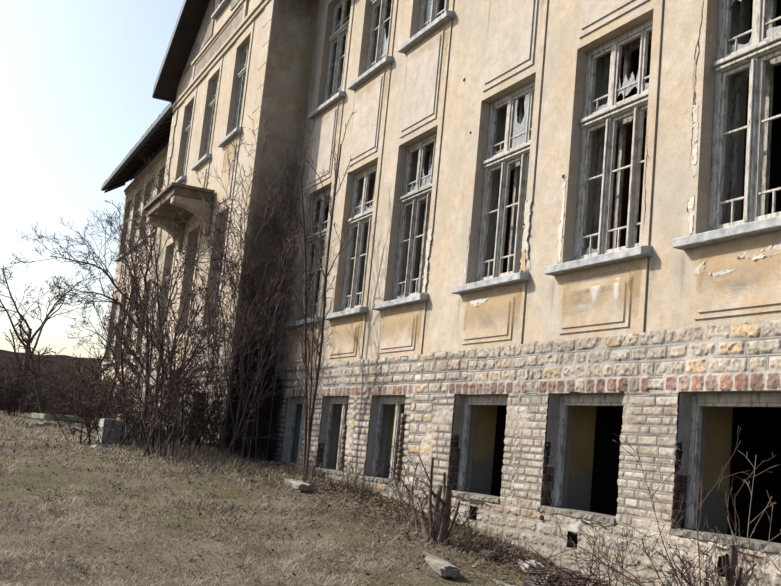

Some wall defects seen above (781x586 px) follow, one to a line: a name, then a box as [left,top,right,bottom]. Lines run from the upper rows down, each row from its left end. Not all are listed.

crack [694,0,704,64]
spalling [691,61,699,178]
spalling [520,199,533,271]
spalling [687,195,695,235]
spalling [695,241,781,277]